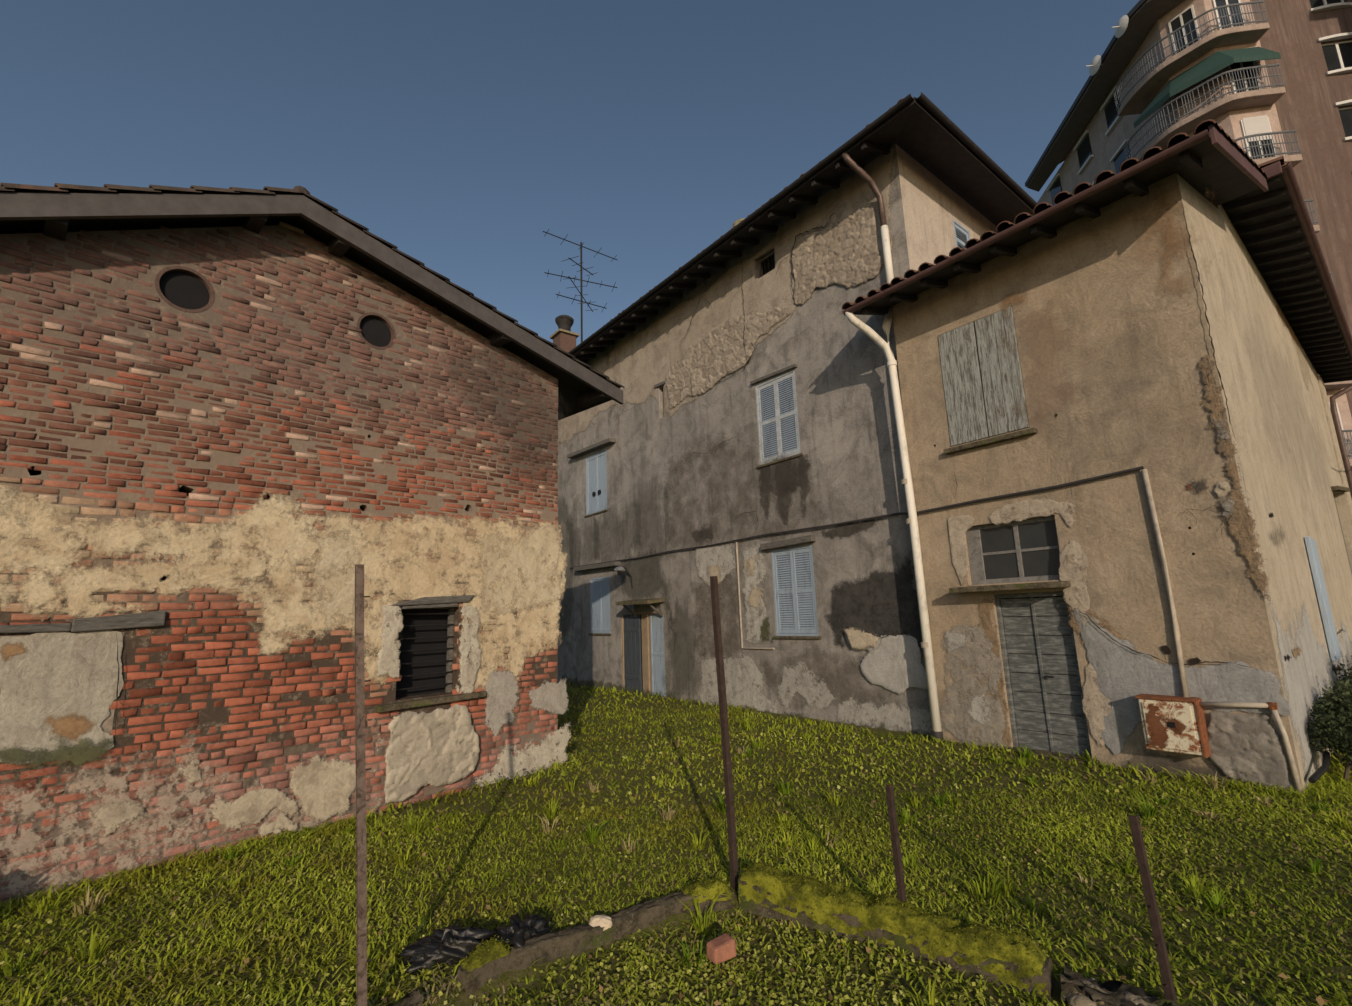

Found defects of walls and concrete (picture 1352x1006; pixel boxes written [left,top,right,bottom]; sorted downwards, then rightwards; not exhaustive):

crack [674,213,834,392]
leakage [671,444,810,543]
peeling [0,484,571,787]
peeling [695,541,767,644]
spalling [1068,606,1136,649]
peeling [88,792,152,837]
peeling [209,754,356,836]